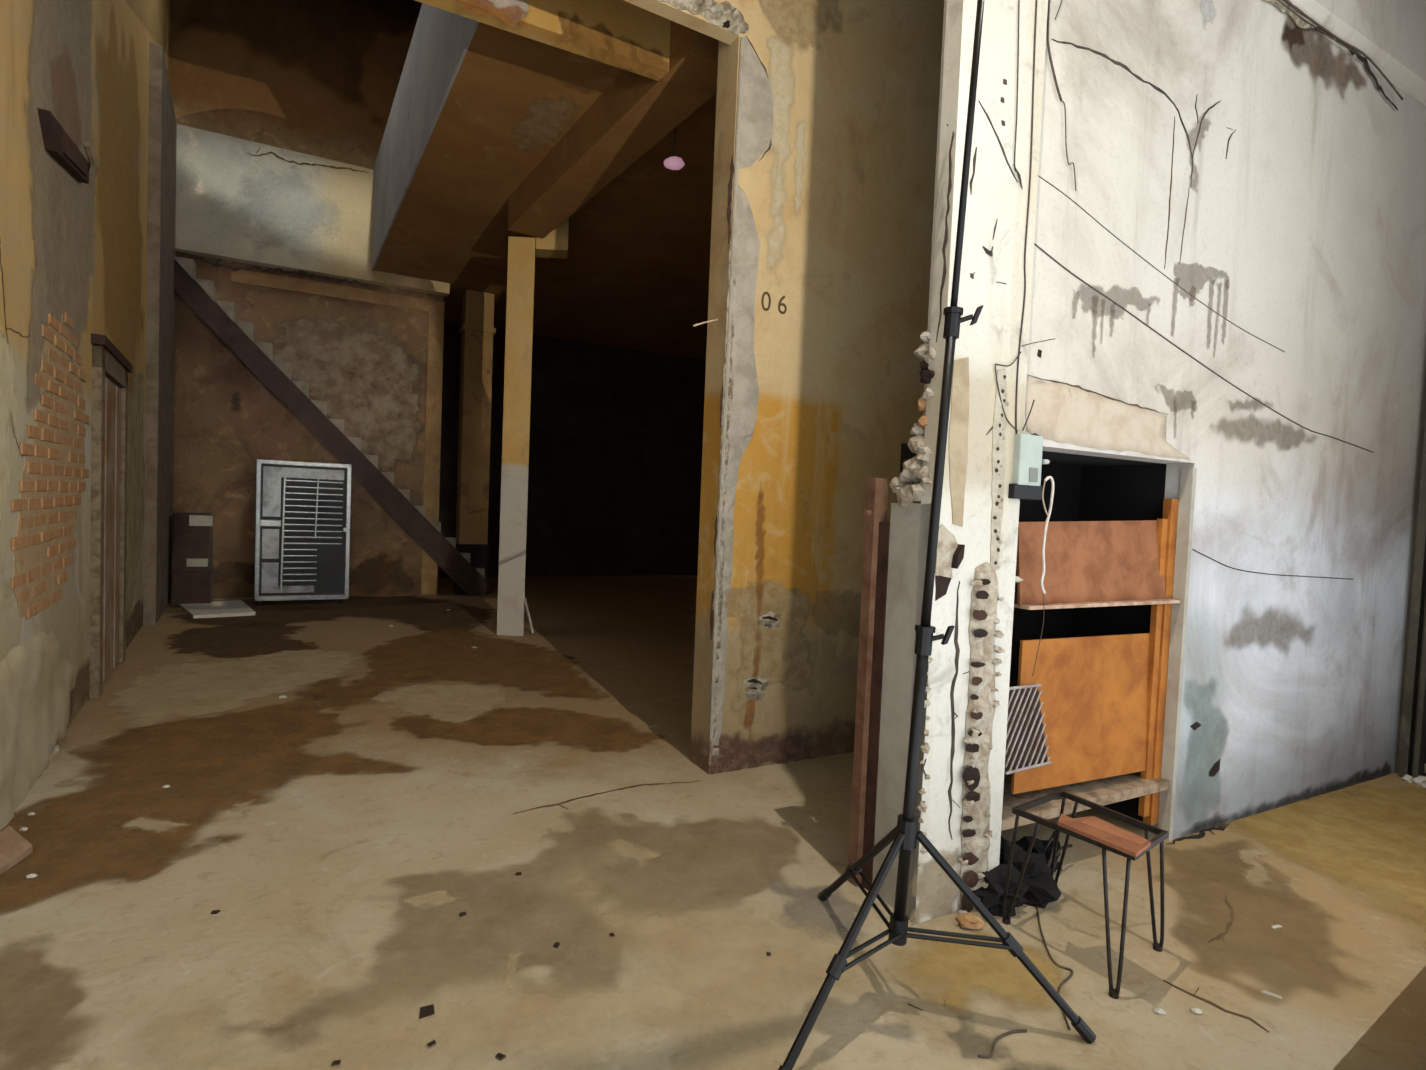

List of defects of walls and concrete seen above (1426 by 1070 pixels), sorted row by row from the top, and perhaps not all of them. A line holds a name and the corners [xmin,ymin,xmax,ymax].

peeling [760,0,840,48]
crack [1052,39,1236,269]
crack [1303,26,1398,111]
flaking render [0,0,97,619]
flaking render [658,0,812,765]
spalling [889,330,937,507]
crack [1028,375,1168,415]
damp [0,554,663,913]
flaking render [935,357,1190,915]
damp [0,953,81,1070]
damp [269,812,1062,1070]